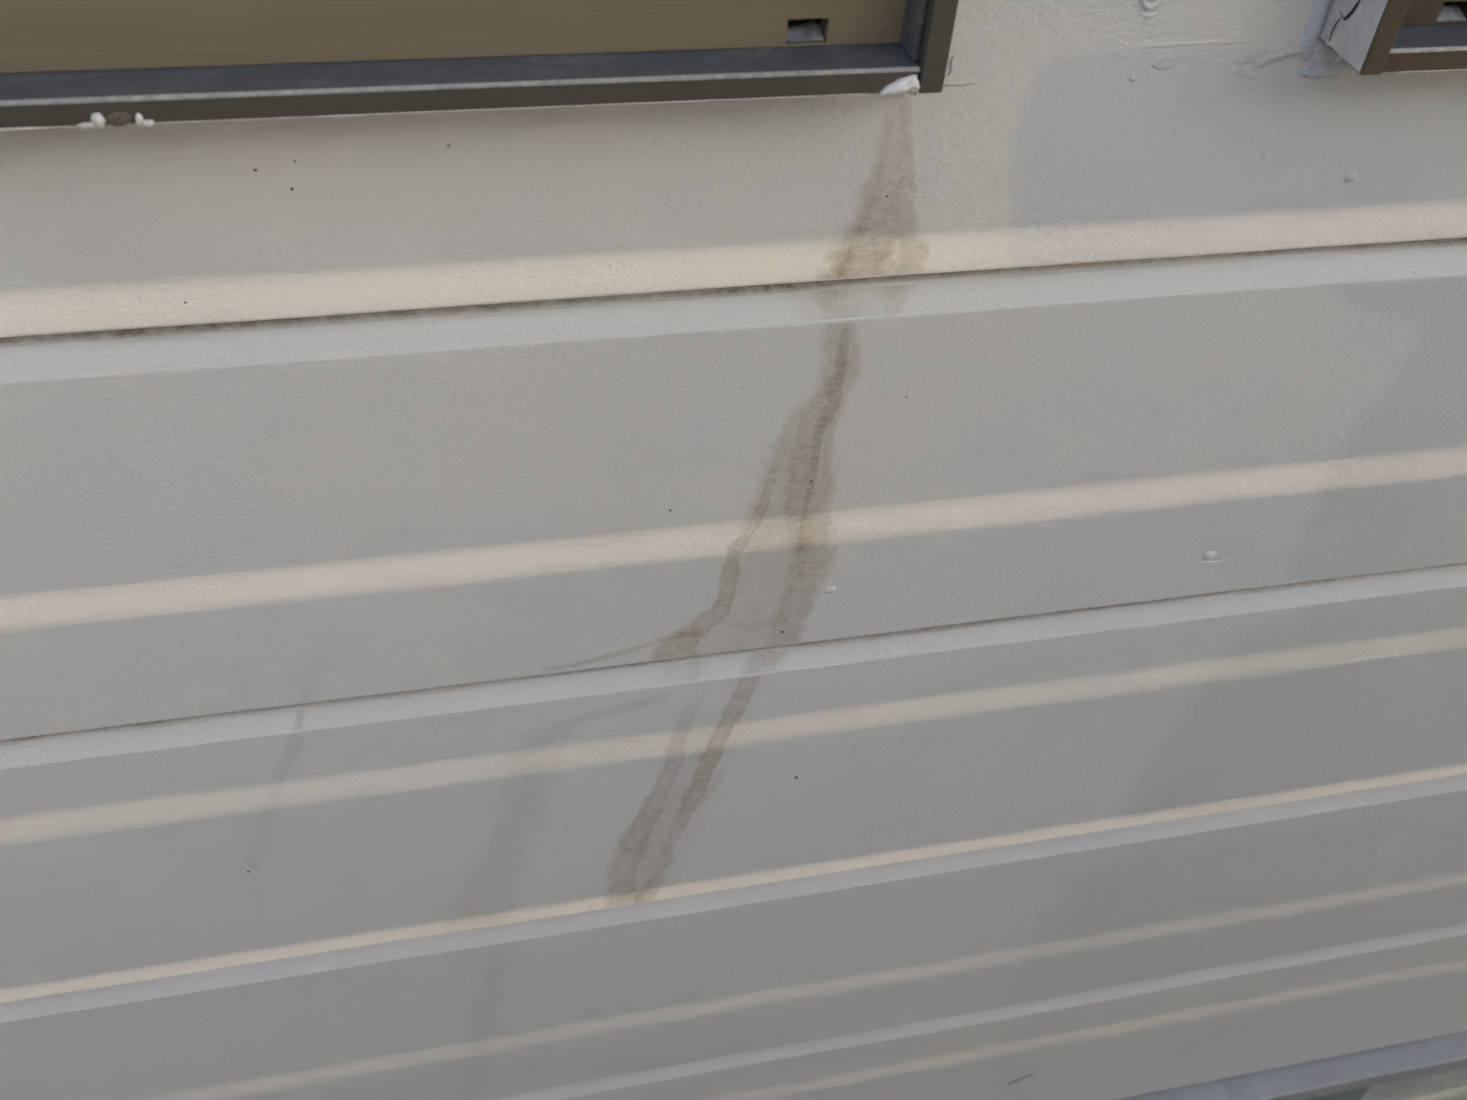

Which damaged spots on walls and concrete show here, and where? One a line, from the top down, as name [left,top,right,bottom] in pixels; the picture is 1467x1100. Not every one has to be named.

damp [406,93,935,938]
damp [454,944,523,1100]